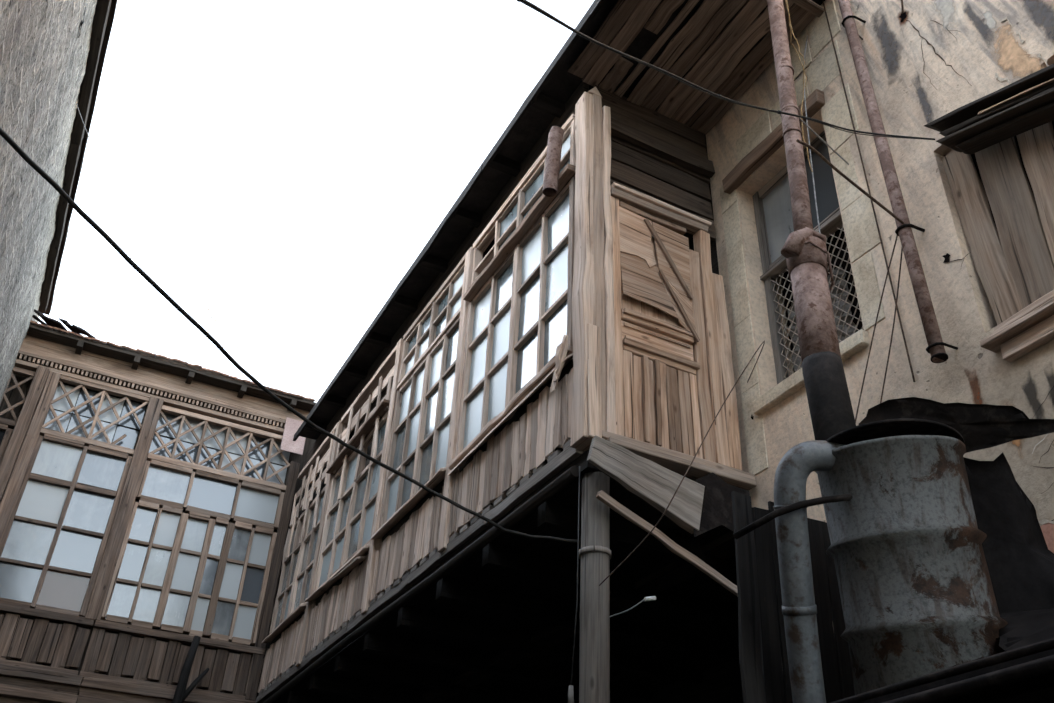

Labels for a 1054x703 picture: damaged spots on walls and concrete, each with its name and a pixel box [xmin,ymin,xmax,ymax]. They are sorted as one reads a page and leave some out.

crack [906,20,972,86]
corrosion [967,372,983,404]
peeling [1039,519,1054,553]